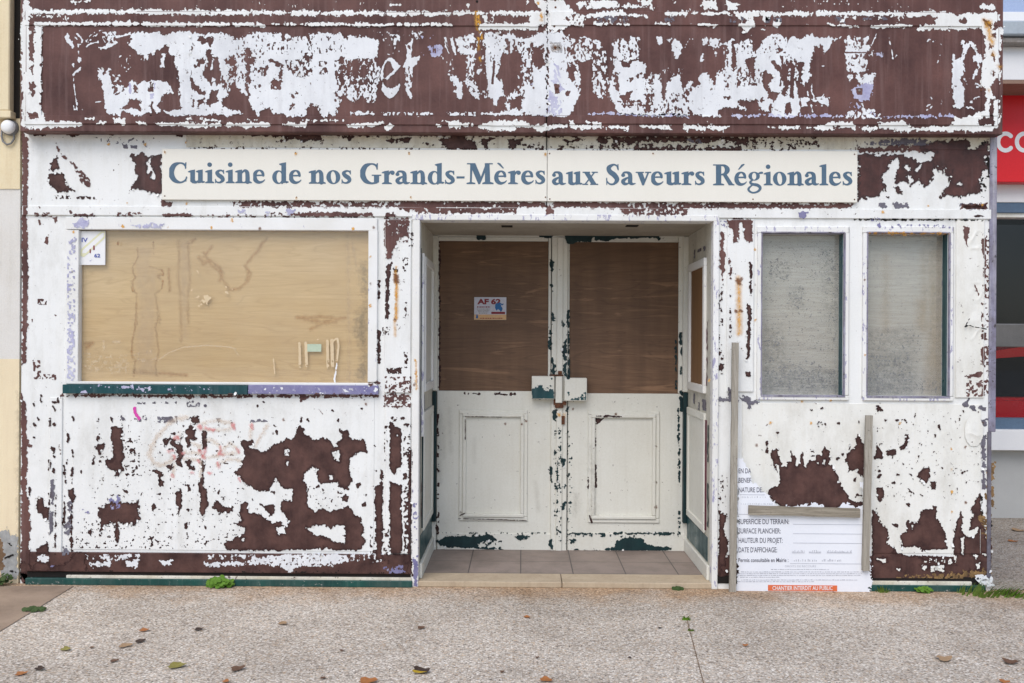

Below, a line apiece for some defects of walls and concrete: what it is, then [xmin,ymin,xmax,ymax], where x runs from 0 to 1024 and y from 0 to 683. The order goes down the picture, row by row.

peeling [18,0,1005,381]
peeling [0,327,422,587]
peeling [435,310,681,551]
peeling [674,332,760,483]
peeling [761,226,995,587]